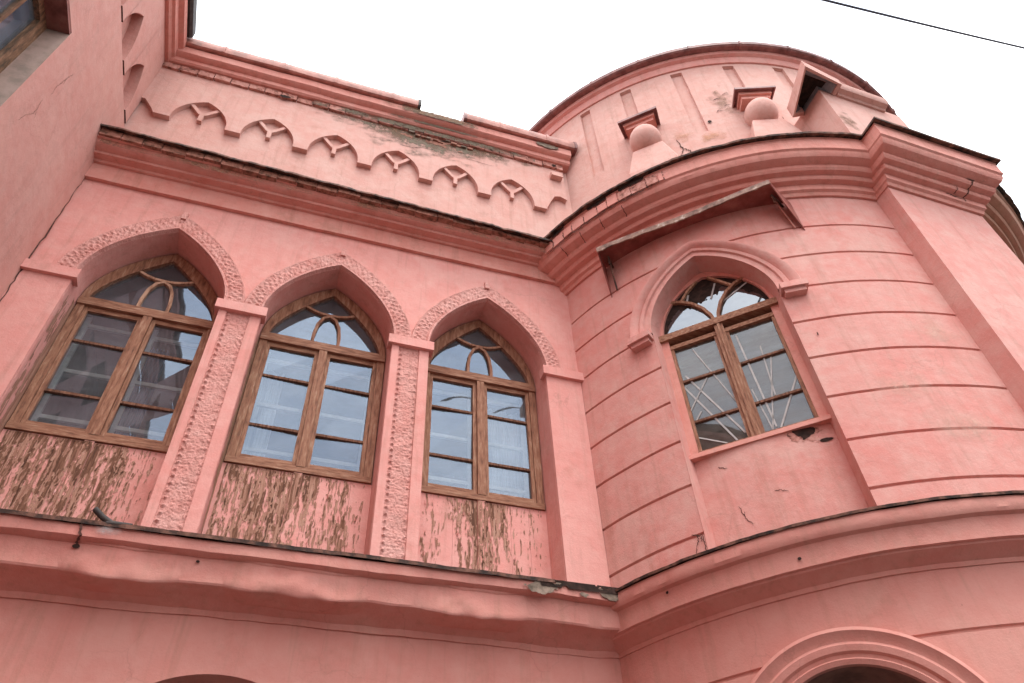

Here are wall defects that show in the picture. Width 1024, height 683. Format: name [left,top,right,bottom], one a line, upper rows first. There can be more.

water stain [339,107,520,160]
peeling [0,295,157,525]
peeling [200,334,366,553]
spalling [784,427,833,443]
peeling [419,493,619,601]